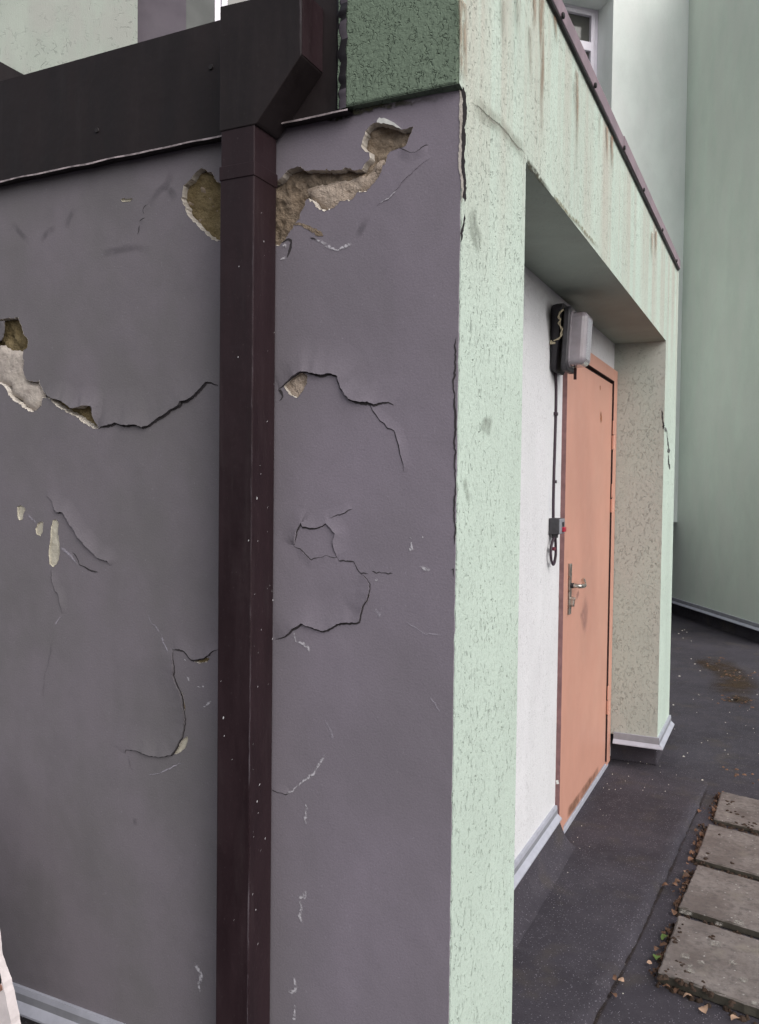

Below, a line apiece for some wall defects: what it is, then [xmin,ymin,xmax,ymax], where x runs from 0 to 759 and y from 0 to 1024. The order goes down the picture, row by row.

corrosion [534,0,555,81]
spalling [181,168,221,241]
spalling [276,117,413,260]
crack [458,87,526,241]
spalling [0,317,103,429]
crack [275,337,411,473]
crack [46,487,119,572]
crack [273,502,393,639]
crack [110,634,218,774]